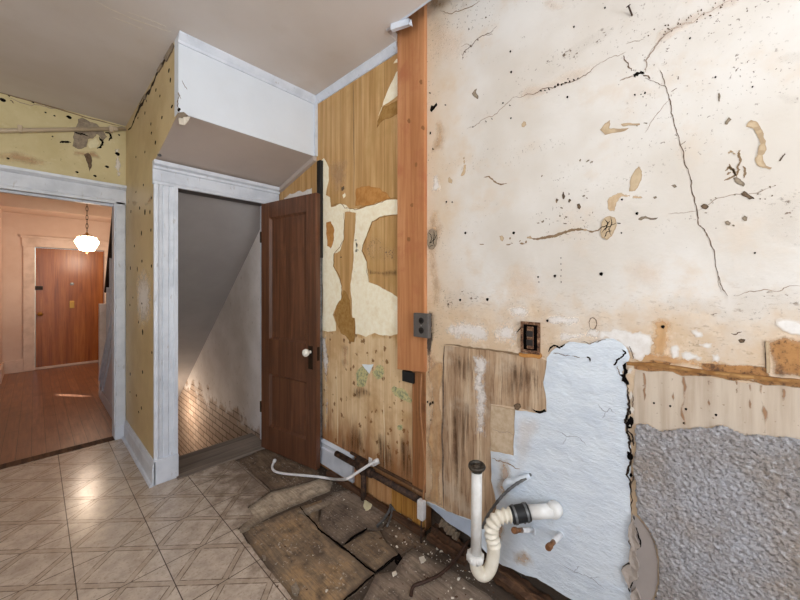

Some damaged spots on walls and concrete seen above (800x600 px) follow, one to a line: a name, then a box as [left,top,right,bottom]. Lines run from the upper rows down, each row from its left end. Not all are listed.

crack [0,43,174,130]
crack [467,52,625,129]
peeling [500,167,642,245]
crack [646,71,798,296]
peeling [746,120,772,169]
water stain [475,358,486,431]
water stain [453,415,466,472]
peeling [427,338,800,600]